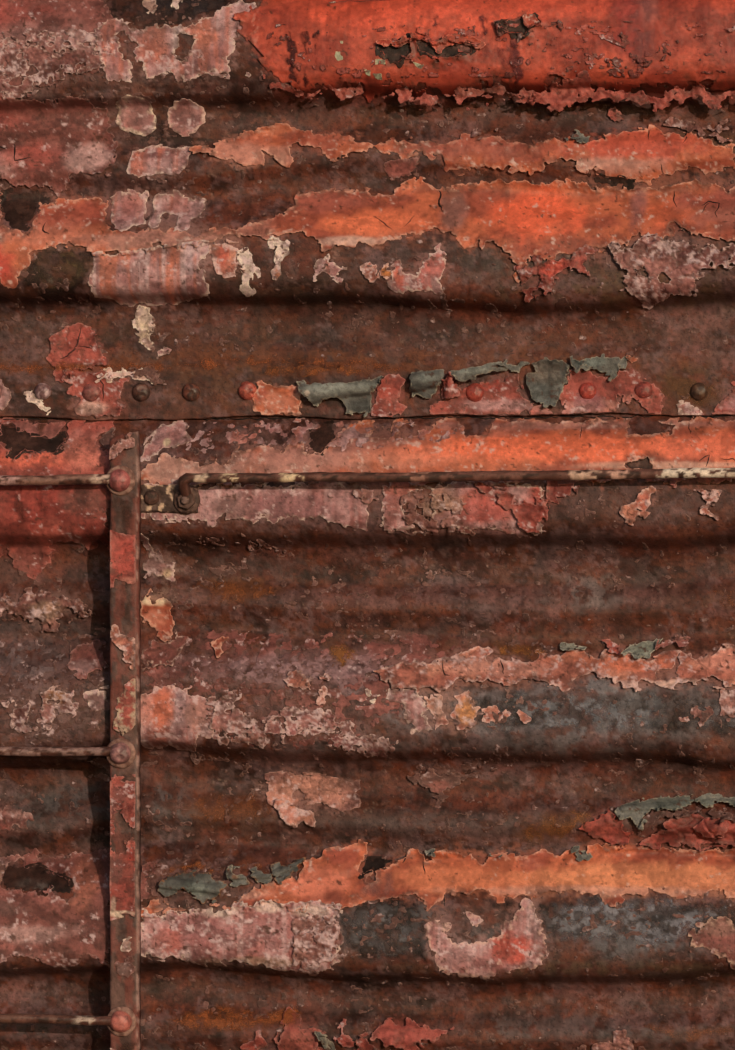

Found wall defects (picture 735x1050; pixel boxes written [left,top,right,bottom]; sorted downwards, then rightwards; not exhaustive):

peeling [0,0,735,744]
peeling [0,533,735,1007]
peeling [84,1025,114,1050]
corrosion [173,1008,298,1030]